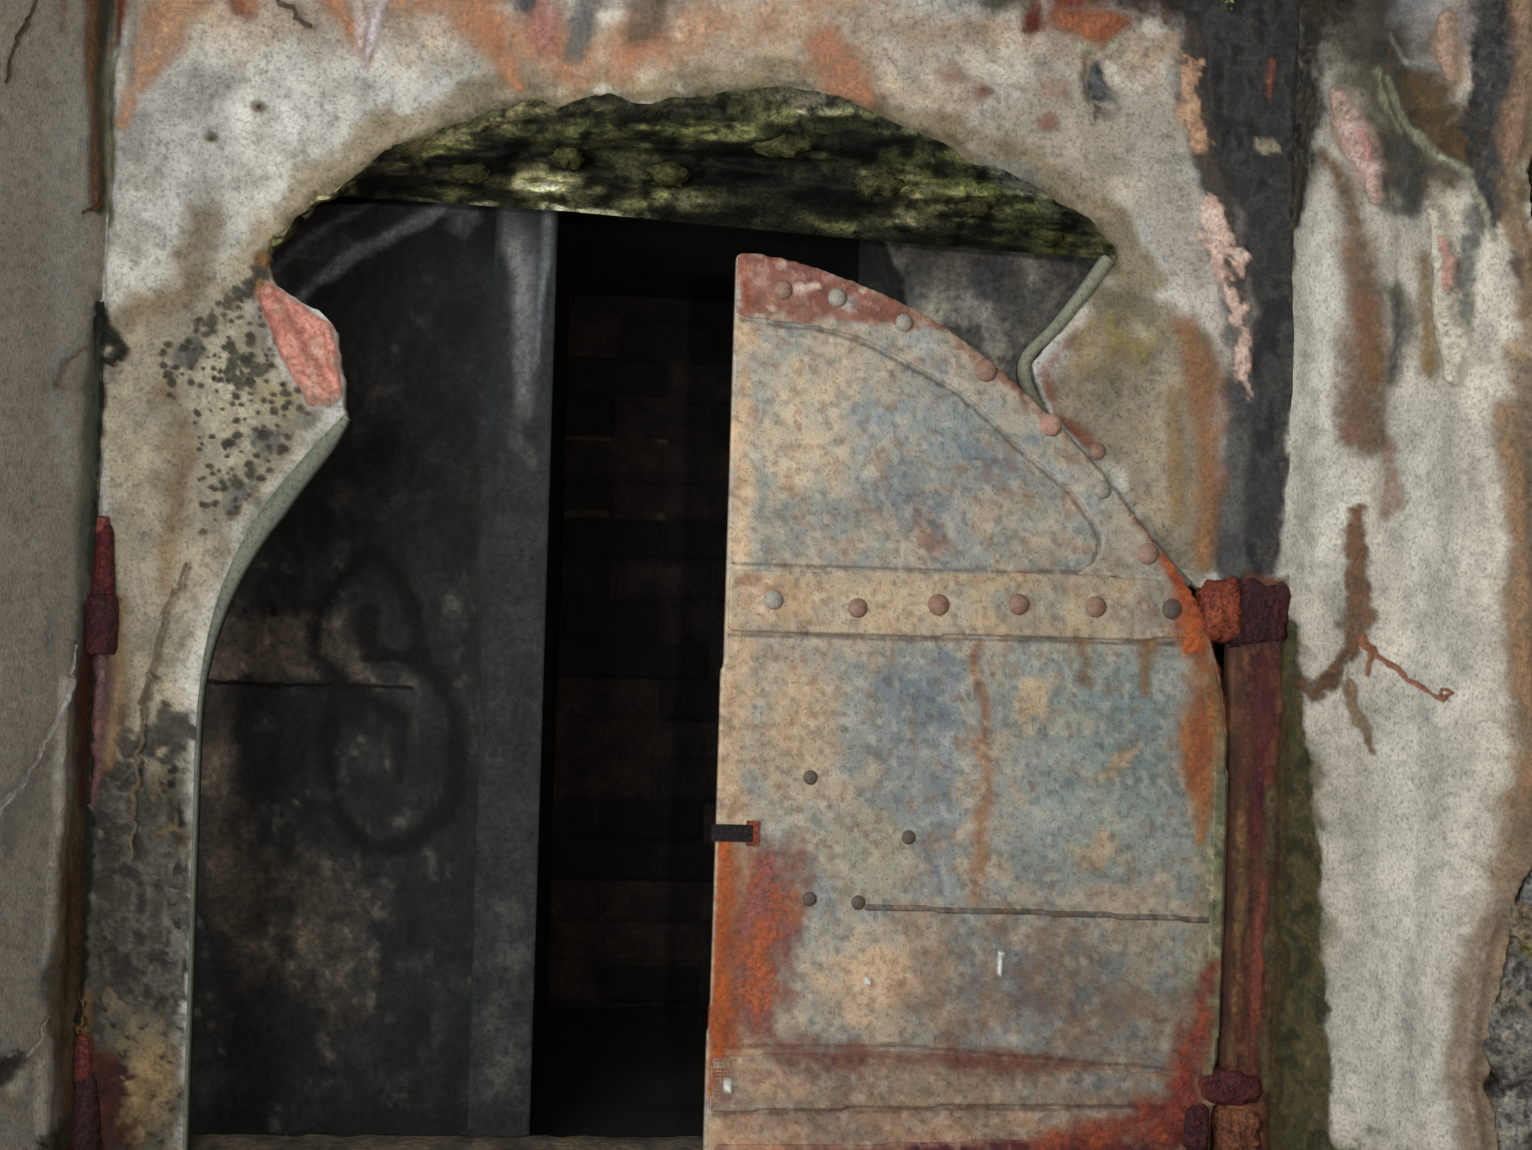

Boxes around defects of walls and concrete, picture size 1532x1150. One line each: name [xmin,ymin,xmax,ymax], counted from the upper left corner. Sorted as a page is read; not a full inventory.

crack [5,0,38,84]
rust [612,0,873,105]
rust [1022,0,1130,47]
peeling [1174,54,1208,153]
peeling [1255,137,1281,155]
peeling [1266,58,1276,97]
spalling [159,86,1116,534]
peeling [1196,194,1252,394]
water stain [1177,0,1353,580]
rust [1317,150,1436,513]
rust [1033,504,1377,1150]
rust [708,841,801,1096]